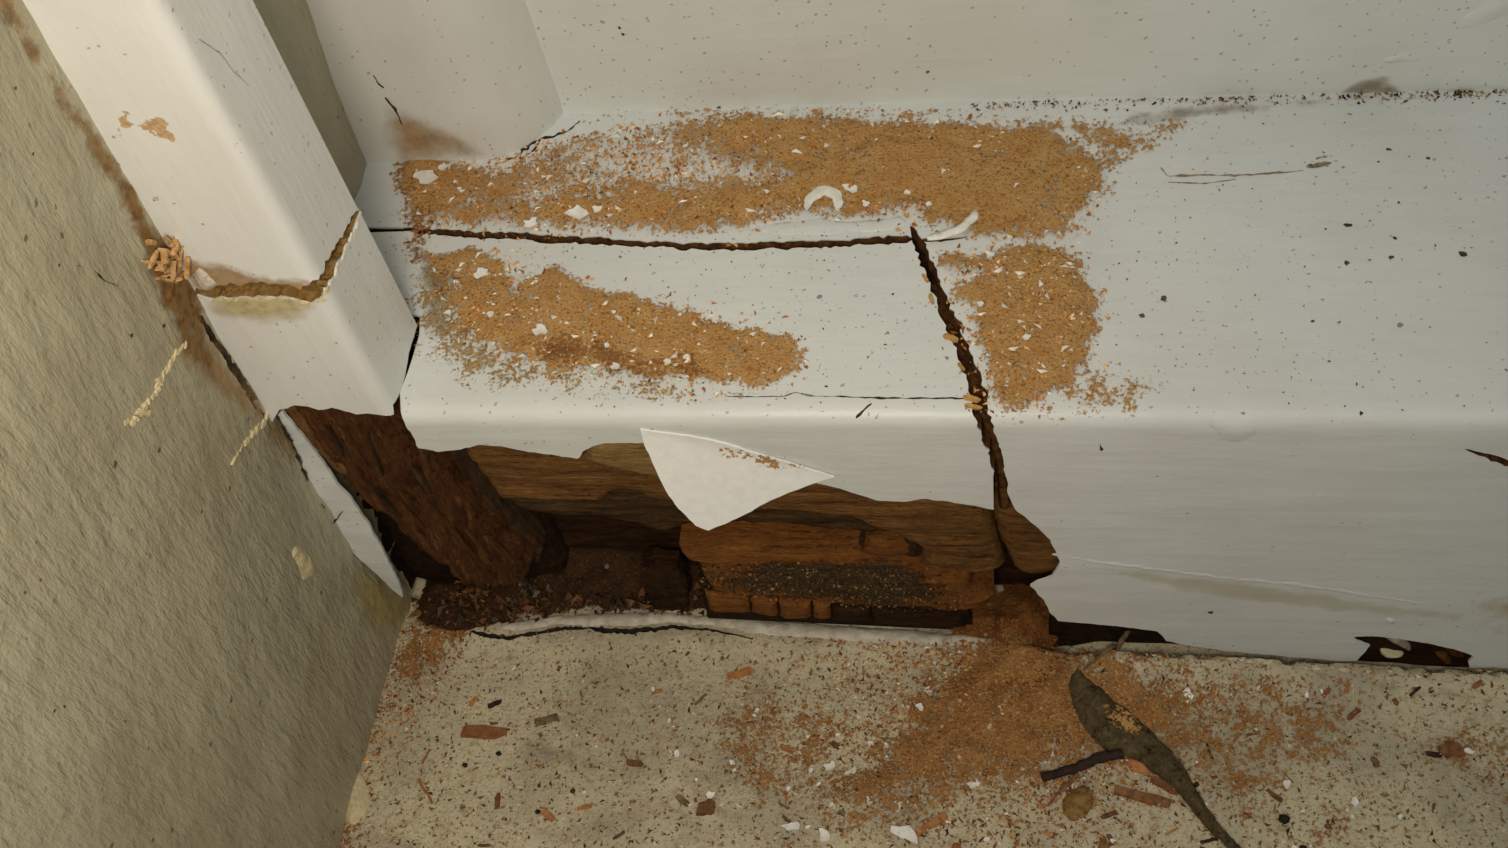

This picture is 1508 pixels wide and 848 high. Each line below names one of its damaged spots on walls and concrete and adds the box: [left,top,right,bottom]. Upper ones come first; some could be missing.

crack [726,391,963,399]
crack [1466,449,1508,466]
peeling [640,428,834,531]
peeling [230,409,404,597]
spalling [1355,636,1472,667]